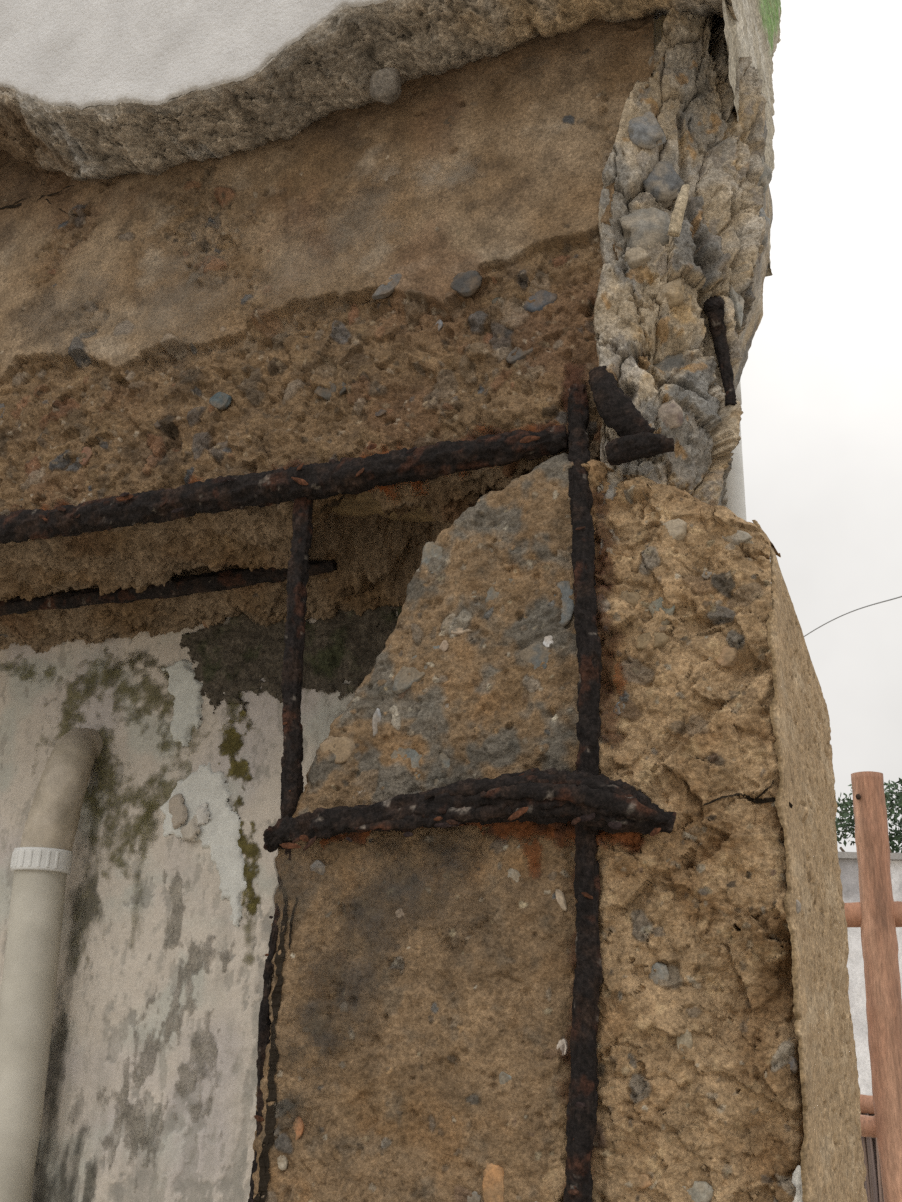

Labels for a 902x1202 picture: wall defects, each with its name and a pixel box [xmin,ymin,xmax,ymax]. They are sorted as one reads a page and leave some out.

spalling [0,13,654,516]
damp [115,654,169,679]
spalling [0,501,294,747]
peeling [160,763,247,928]
spalling [292,448,580,818]
rust [280,768,669,877]
spalling [581,7,804,1202]
damp [33,870,250,1202]
spalling [249,825,577,1202]